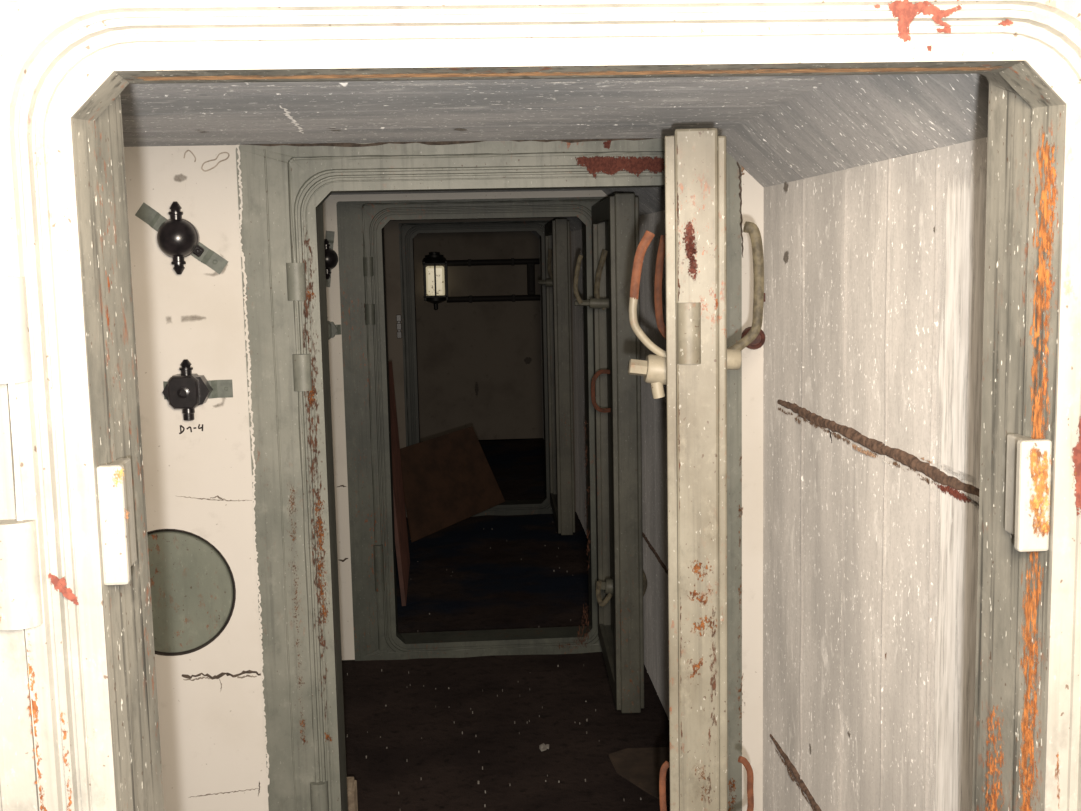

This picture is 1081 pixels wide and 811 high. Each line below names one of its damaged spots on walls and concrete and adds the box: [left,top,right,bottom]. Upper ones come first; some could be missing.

rust [575,140,665,179]
rust [677,182,698,298]
rust [1029,127,1058,536]
rust [302,233,328,717]
rust [1072,419,1081,516]
rust [27,650,47,811]
crack [182,670,261,689]
rust [287,485,308,743]
rust [985,705,1004,811]
rust [1019,551,1044,811]